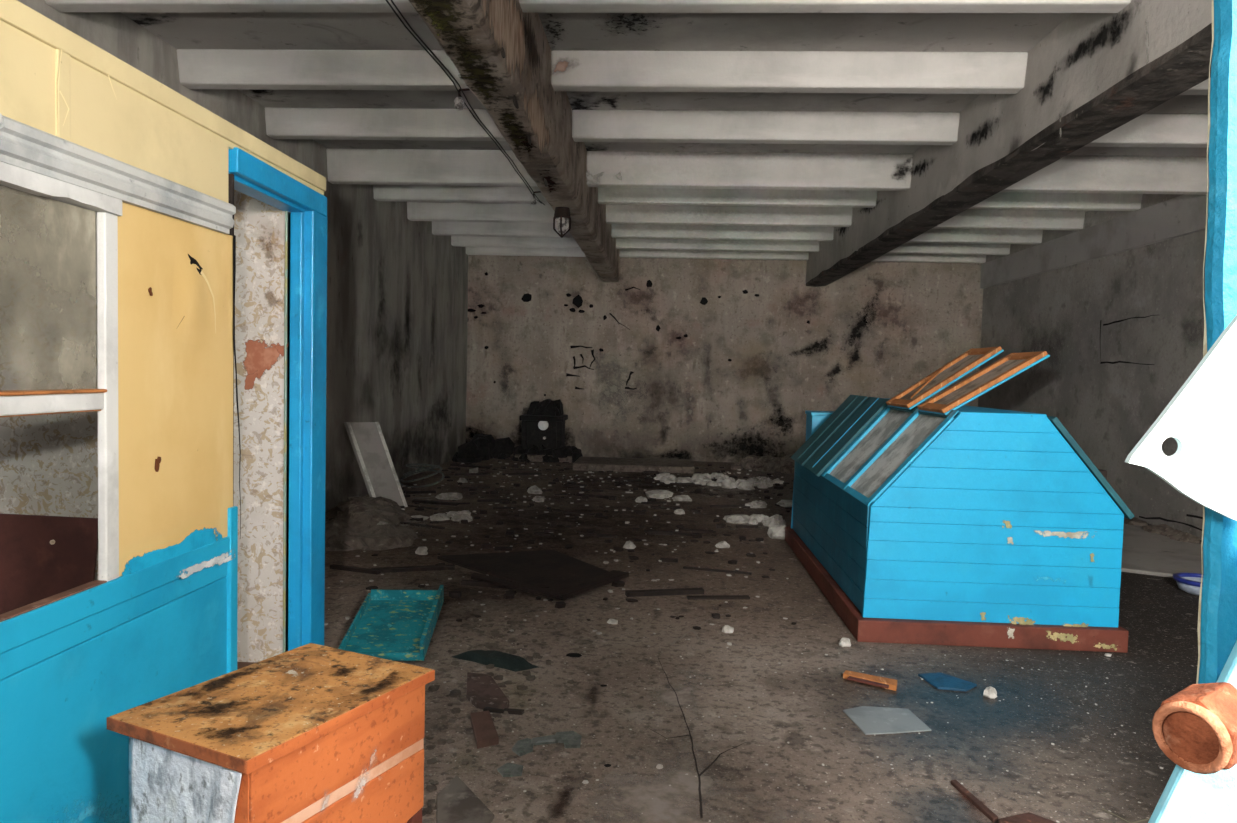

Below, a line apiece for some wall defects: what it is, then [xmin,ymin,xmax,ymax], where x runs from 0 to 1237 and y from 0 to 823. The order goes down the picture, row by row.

leakage [482,0,564,153]
leakage [599,13,659,34]
leakage [1036,11,1130,105]
leakage [795,295,878,380]
leakage [621,450,691,460]
leakage [709,399,793,460]